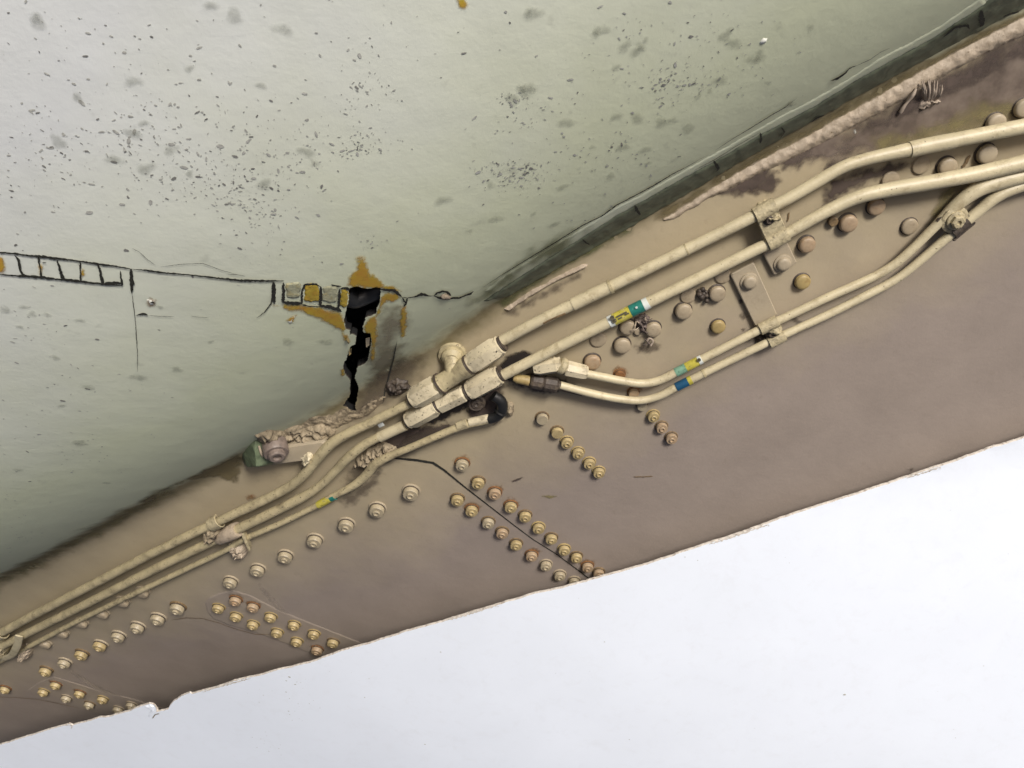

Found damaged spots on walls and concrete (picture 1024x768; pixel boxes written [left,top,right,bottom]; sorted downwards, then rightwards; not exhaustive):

crack [380,101,793,306]
water stain [825,163,905,203]
water stain [721,38,1024,195]
water stain [933,186,957,218]
crack [0,248,350,371]
spalling [283,257,407,404]